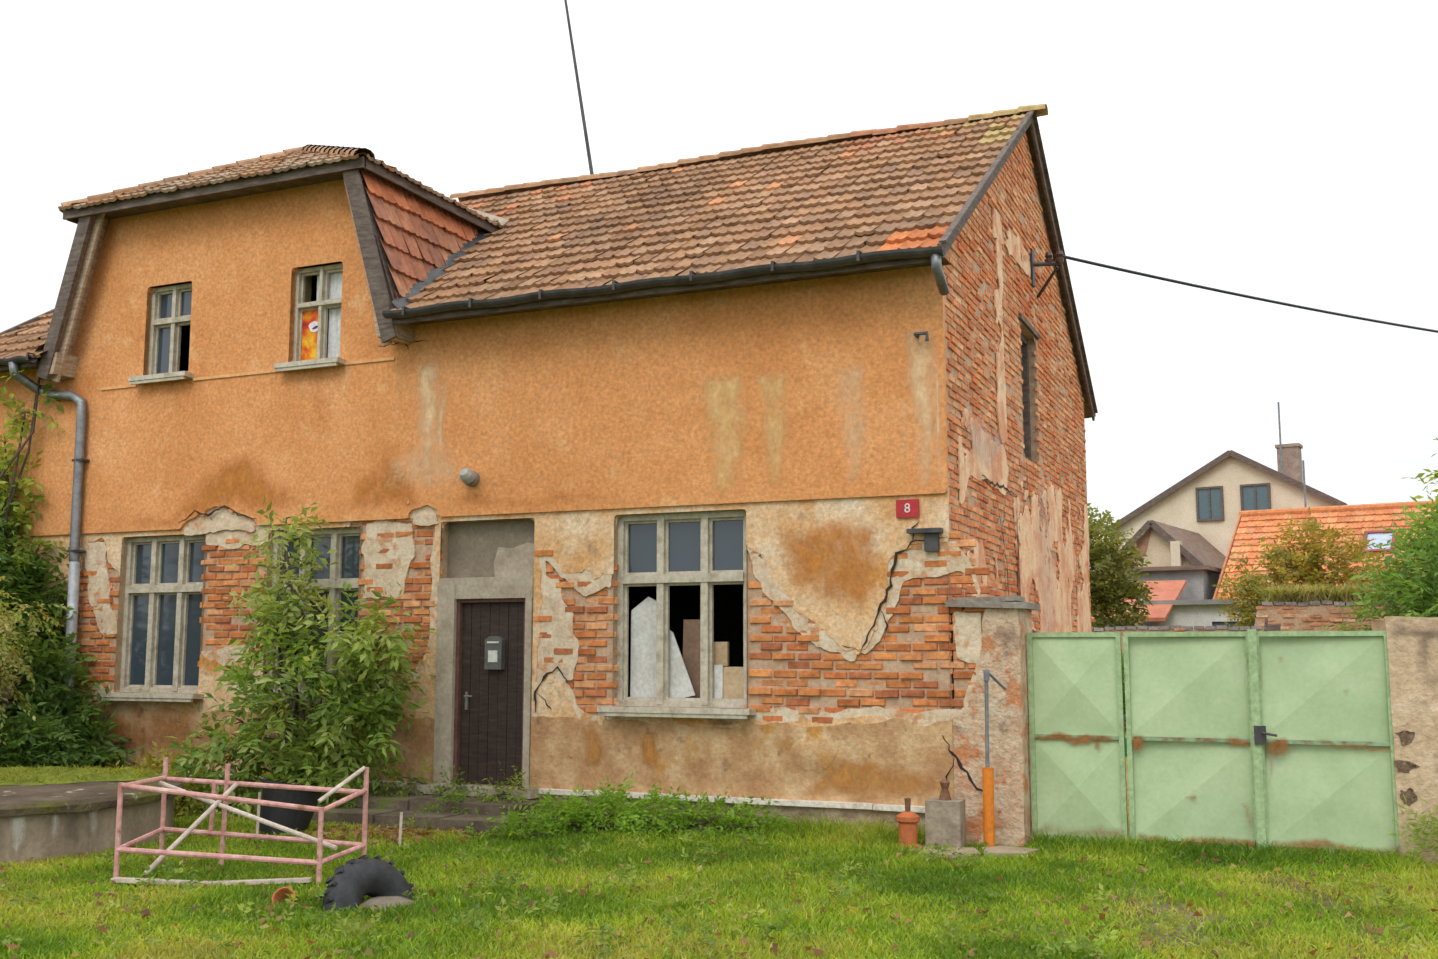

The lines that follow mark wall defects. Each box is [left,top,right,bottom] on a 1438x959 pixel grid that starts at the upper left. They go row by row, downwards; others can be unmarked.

peeling [957,208,1091,632]
flaking render [39,538,120,693]
flaking render [182,506,283,668]
flaking render [346,498,444,685]
flaking render [533,550,636,725]
water stain [788,527,870,593]
flaking render [715,532,998,726]
crack [842,522,946,652]
rust [1044,733,1110,748]
rust [1268,739,1286,755]